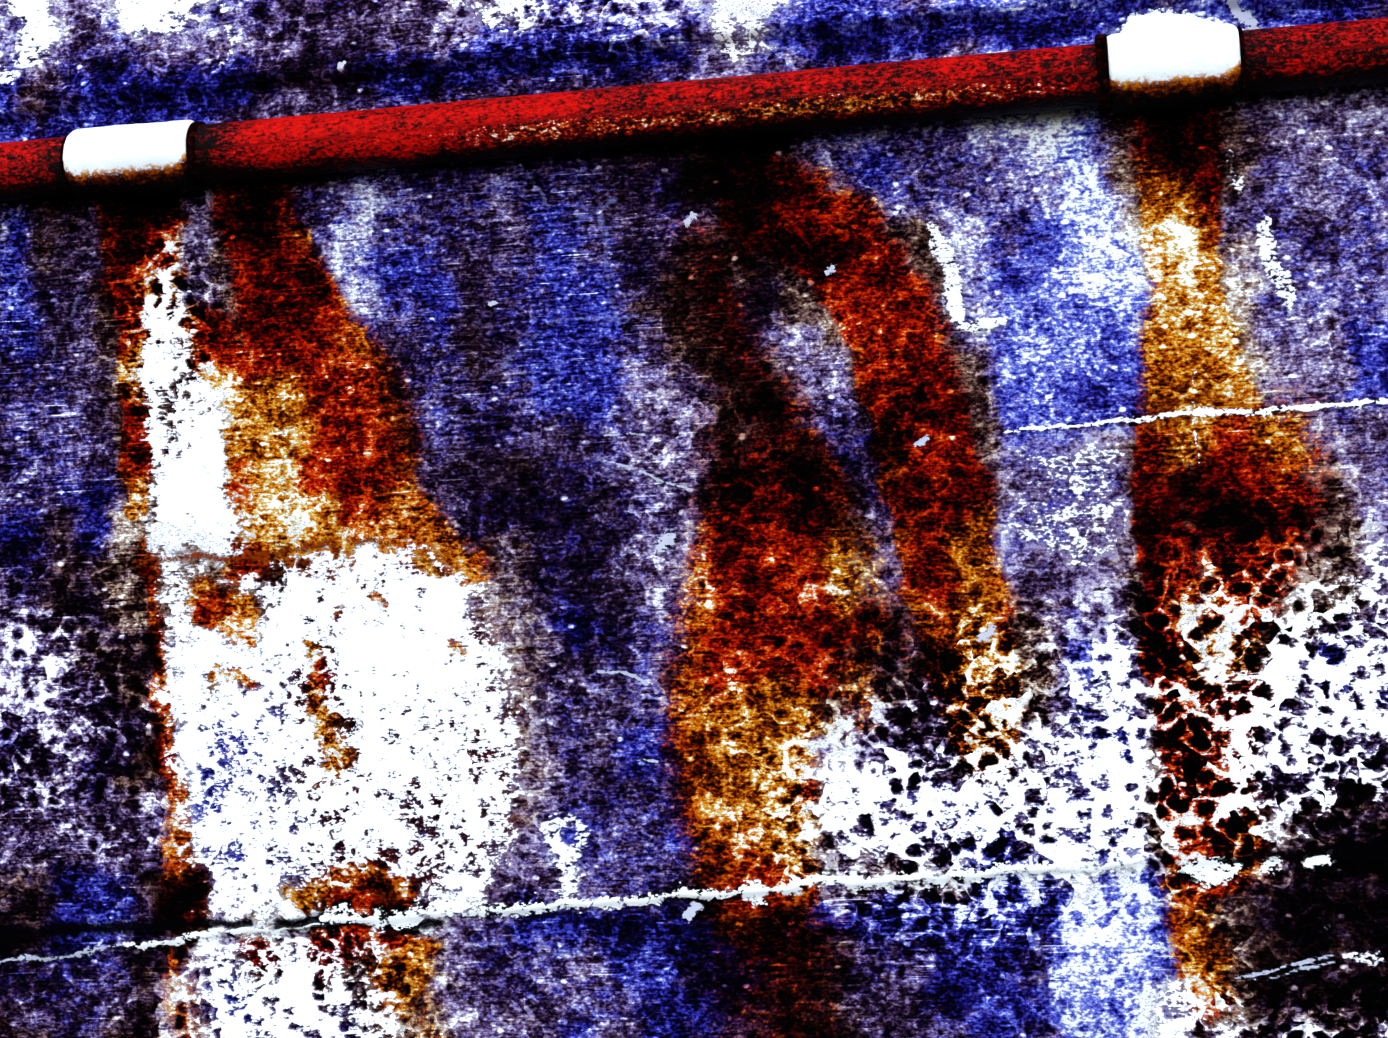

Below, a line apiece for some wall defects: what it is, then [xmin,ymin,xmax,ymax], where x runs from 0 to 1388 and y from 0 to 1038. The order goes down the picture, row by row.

crack [0,911,443,944]
corrosion [95,177,525,1038]
peeling [115,234,546,1038]
corrosion [659,136,1030,1038]
peeling [775,432,1388,908]
crack [1004,371,1388,463]
corrosion [1126,104,1347,1024]